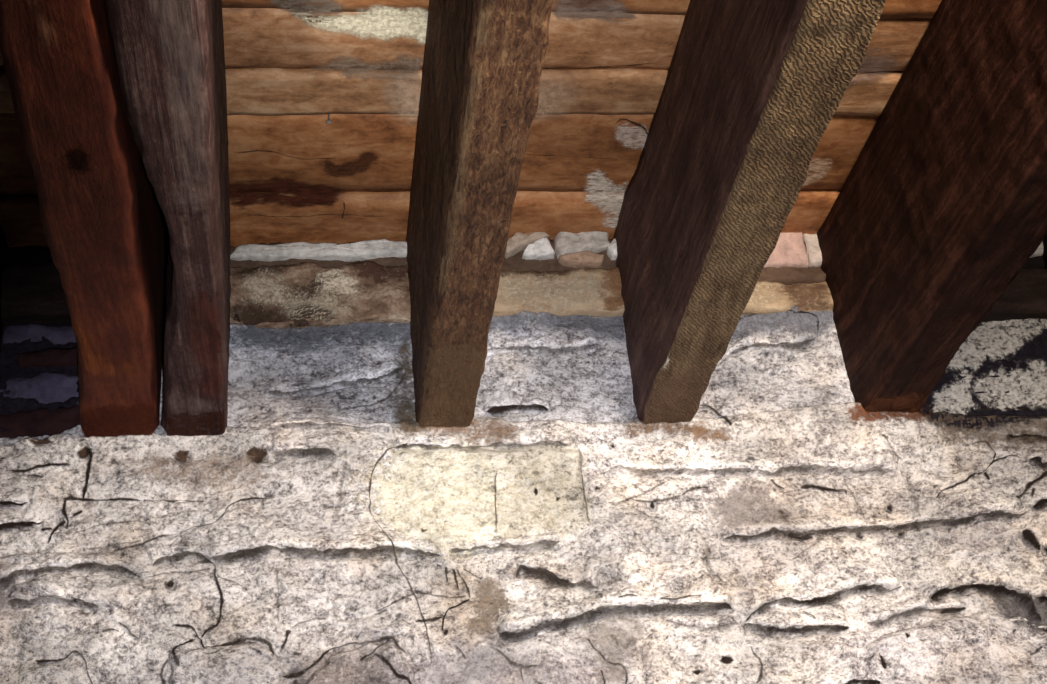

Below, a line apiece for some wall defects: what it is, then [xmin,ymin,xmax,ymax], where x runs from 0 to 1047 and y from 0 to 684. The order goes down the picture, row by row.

damp [293,7,428,43]
damp [229,152,378,209]
damp [585,171,625,228]
spalling [176,450,189,462]
spalling [247,447,267,463]
crack [7,448,268,550]
crack [160,438,538,684]
crack [102,622,139,639]
spalling [993,583,1047,632]
crack [36,651,93,684]